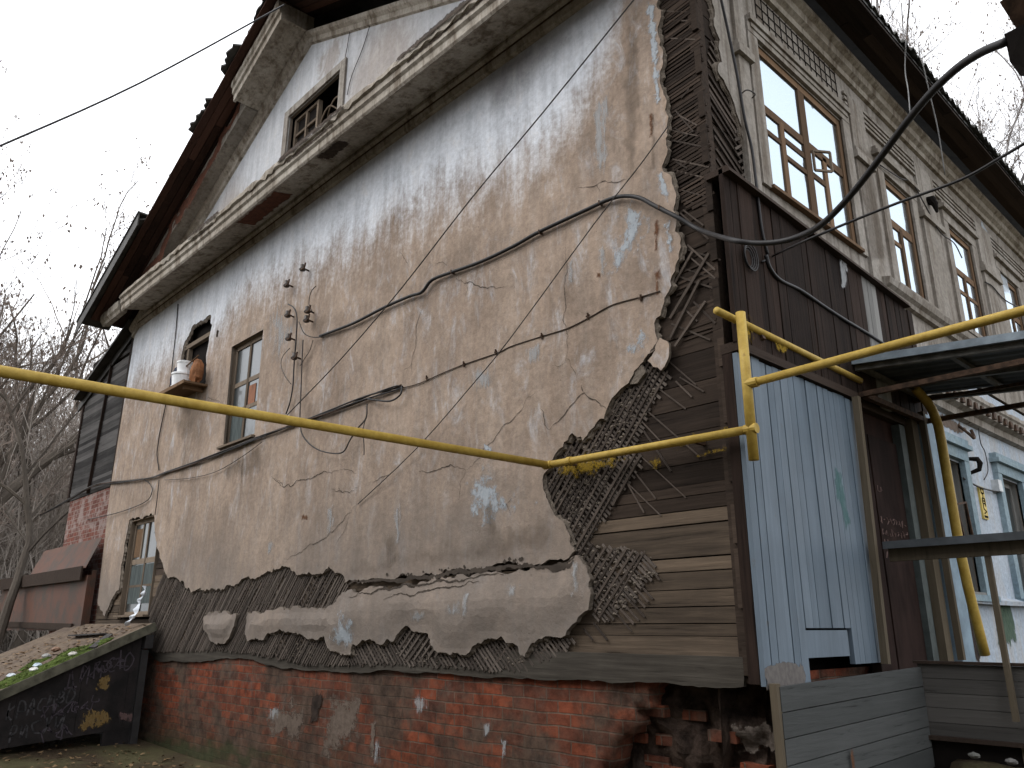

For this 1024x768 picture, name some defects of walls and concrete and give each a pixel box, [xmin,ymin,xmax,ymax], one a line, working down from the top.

peeling [407,0,482,63]
flaking render [182,315,219,360]
crack [419,247,604,500]
flaking render [543,0,745,641]
crack [274,469,388,557]
peeling [471,476,515,522]
flaking render [105,520,133,618]
flaking render [148,566,576,673]
spalling [623,683,777,768]